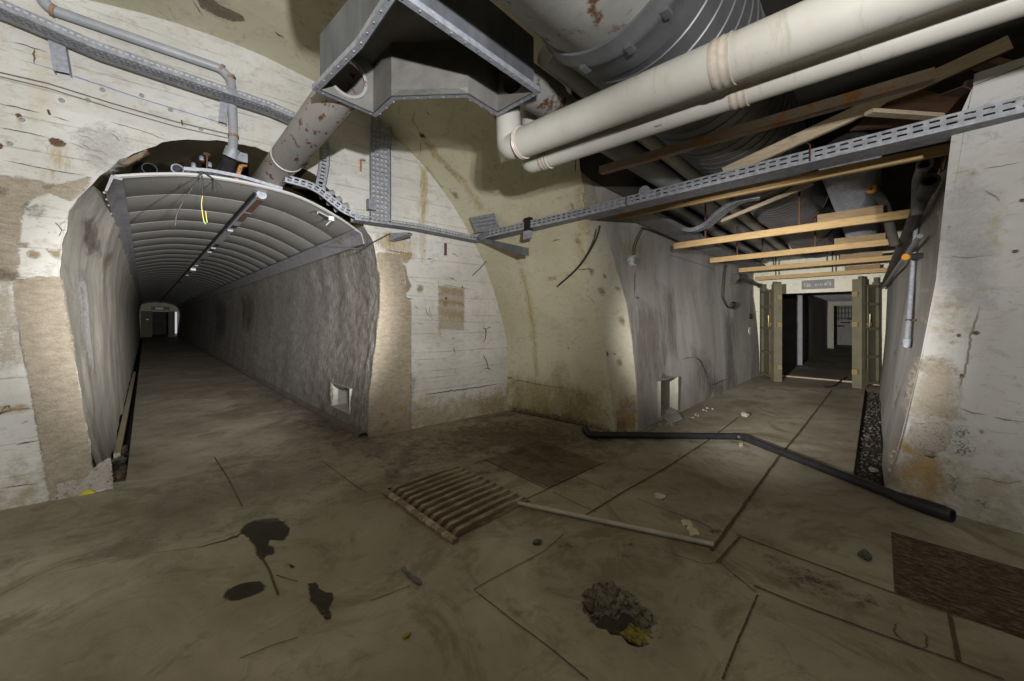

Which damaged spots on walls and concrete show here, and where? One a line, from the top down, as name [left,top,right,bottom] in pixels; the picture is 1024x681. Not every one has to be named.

flaking render [0,133,146,501]
flaking render [368,252,412,438]
crack [960,315,1023,422]
leakage [895,441,959,502]
leakage [198,518,290,558]
leakage [223,581,266,601]
leakage [308,583,333,619]
spalling [571,572,668,653]